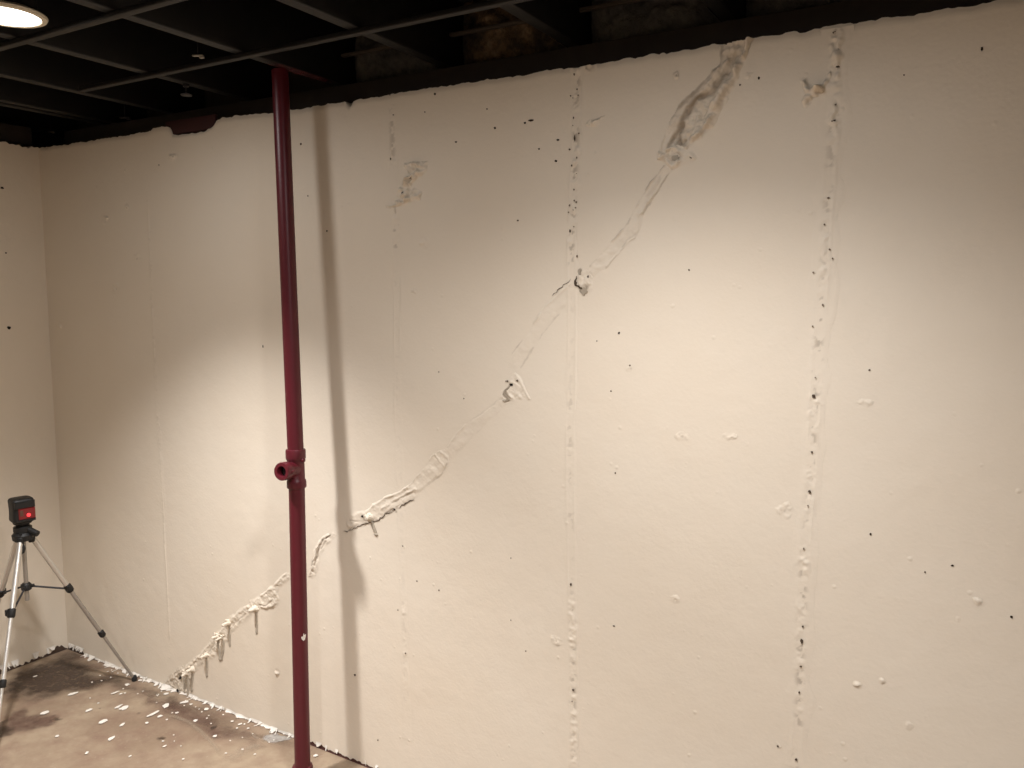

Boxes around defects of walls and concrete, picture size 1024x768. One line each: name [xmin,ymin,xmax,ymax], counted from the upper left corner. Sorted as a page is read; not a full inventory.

crack [165,37,754,696]